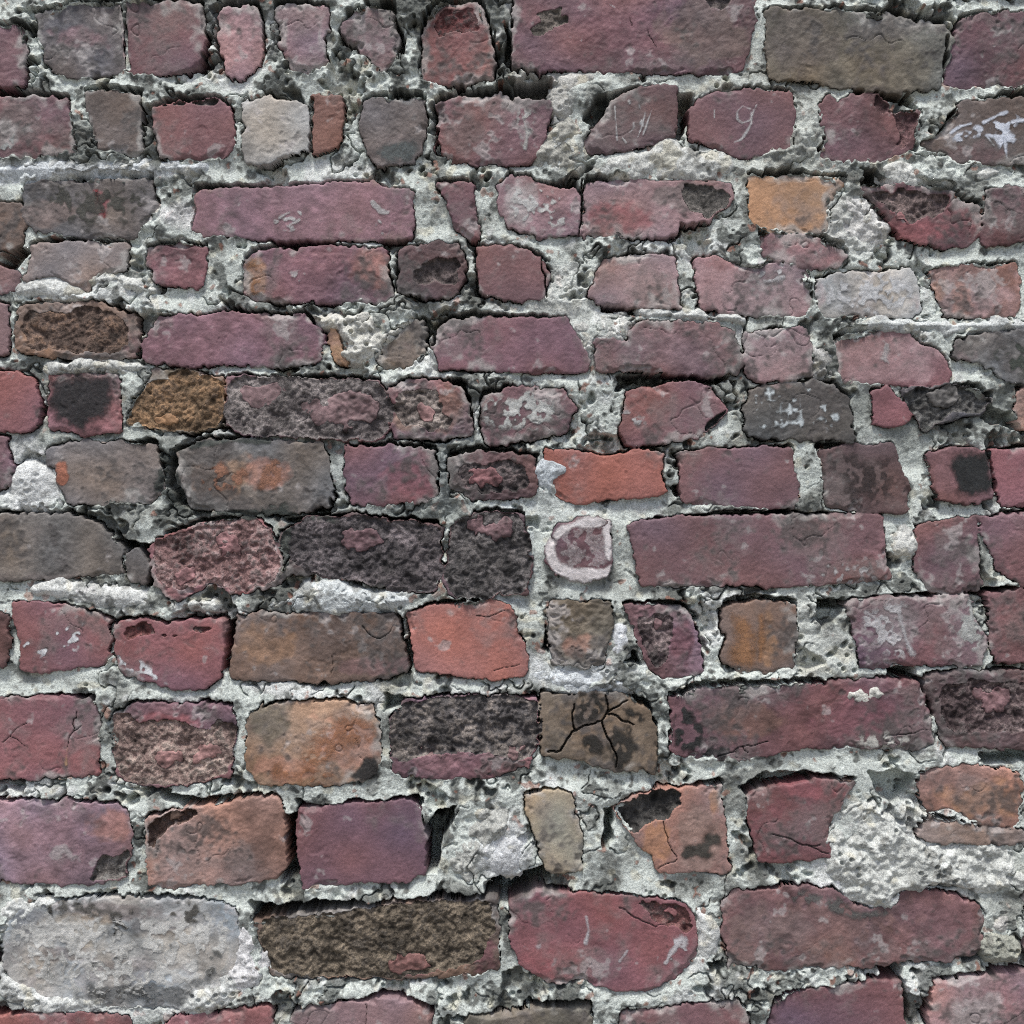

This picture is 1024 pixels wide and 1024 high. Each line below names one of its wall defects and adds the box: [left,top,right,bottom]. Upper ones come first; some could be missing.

spalling [681,183,731,219]
spalling [872,188,949,224]
crack [548,695,634,765]
spalling [614,788,682,833]